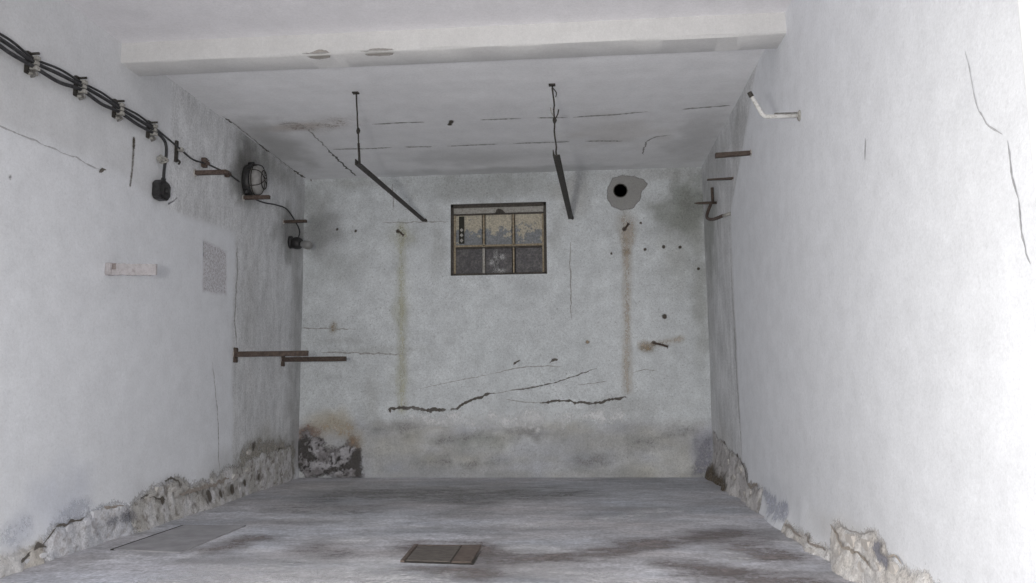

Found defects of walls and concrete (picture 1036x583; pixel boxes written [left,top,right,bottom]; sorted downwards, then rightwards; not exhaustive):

crack [280,122,432,176]
crack [458,112,641,146]
crack [965,53,1030,263]
crack [388,365,656,413]
spalling [0,428,365,578]
spalling [704,432,763,513]
spalling [781,520,933,583]